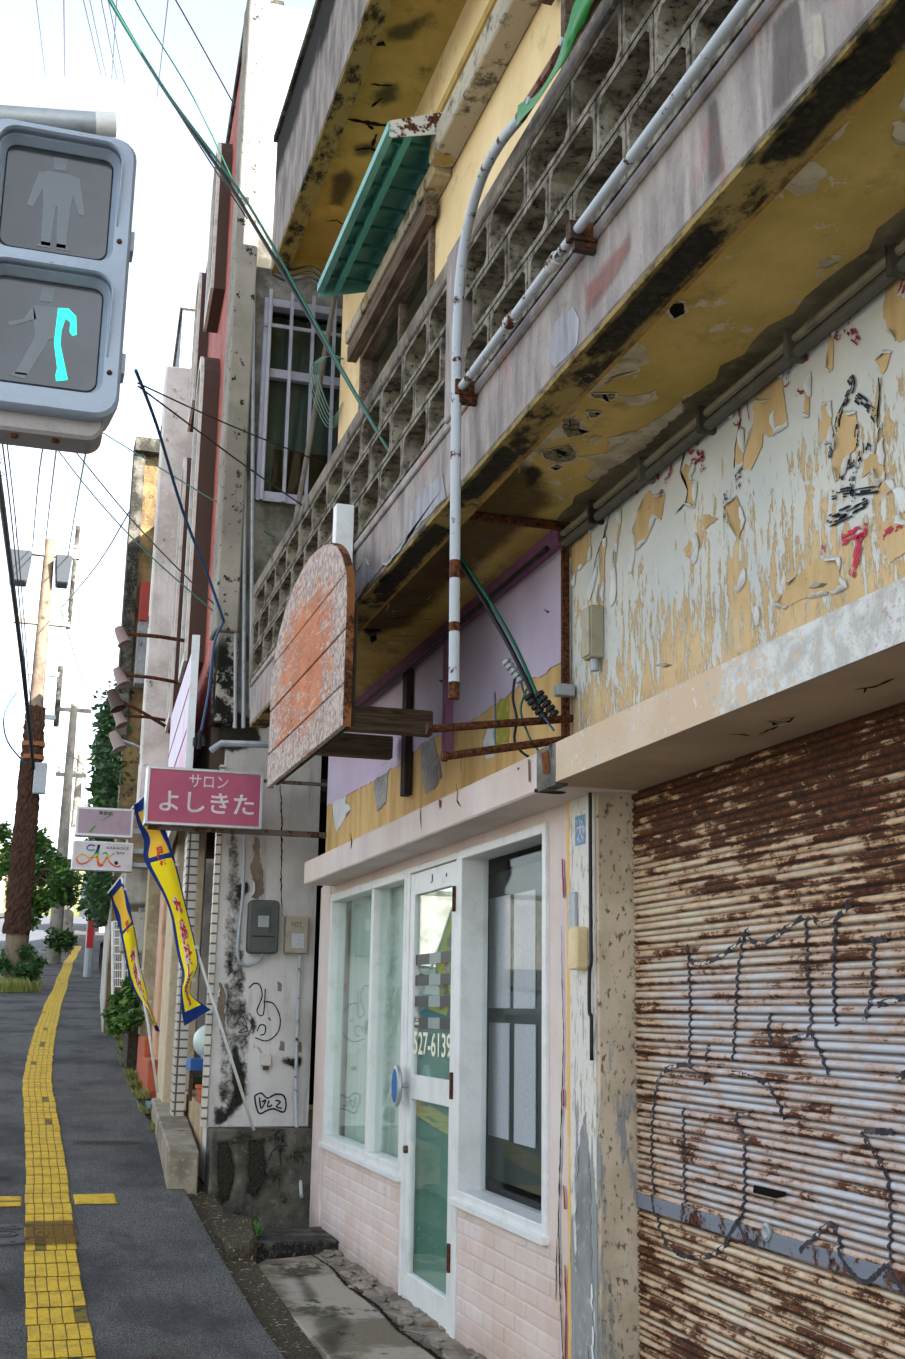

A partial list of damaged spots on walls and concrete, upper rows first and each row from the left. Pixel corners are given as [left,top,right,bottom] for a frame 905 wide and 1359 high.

damp [760,0,905,165]
damp [333,172,352,204]
peeling [785,161,827,196]
damp [586,225,718,356]
peeling [517,208,905,607]
damp [365,446,548,634]
peeling [753,556,847,626]
peeling [420,738,442,794]
peeling [482,717,495,759]
peeling [332,796,351,832]
damp [214,834,256,1124]
damp [217,1138,283,1201]